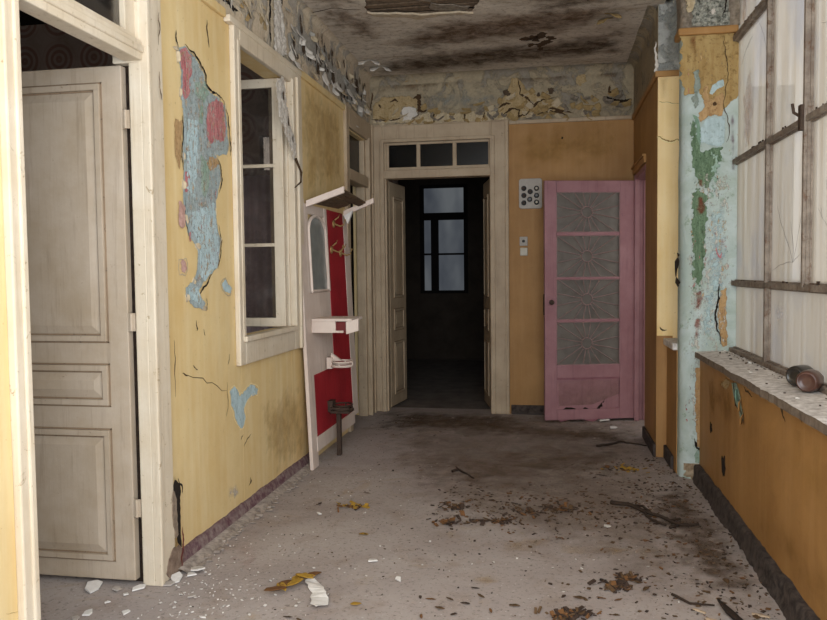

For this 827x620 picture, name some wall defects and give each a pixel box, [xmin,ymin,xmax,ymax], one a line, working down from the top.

crack [269,0,287,57]
peeling [223,0,632,128]
leakage [392,38,614,69]
leakage [418,0,595,45]
spalling [685,0,730,27]
peeling [688,36,730,147]
peeling [173,32,232,311]
peeling [174,342,259,444]